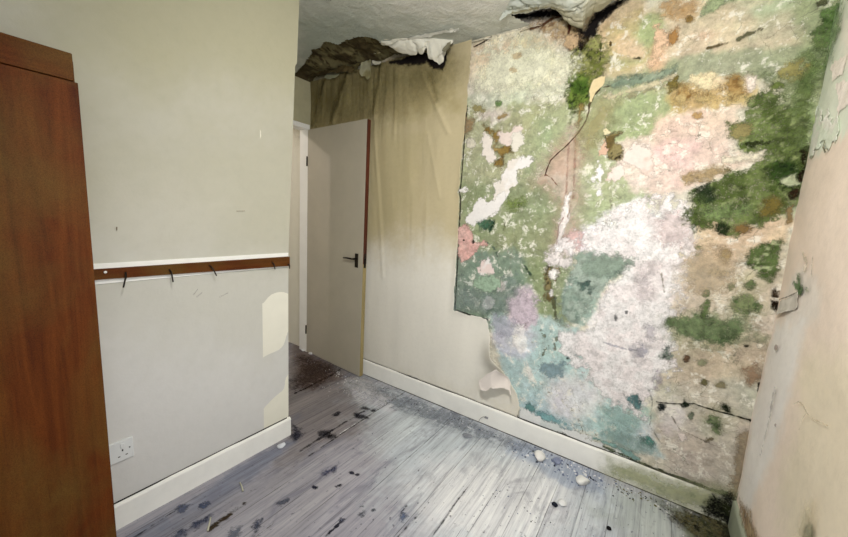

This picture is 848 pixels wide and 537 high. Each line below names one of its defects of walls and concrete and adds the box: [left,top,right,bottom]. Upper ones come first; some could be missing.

peeling [308,52,381,80]
damp [310,65,440,122]
peeling [809,0,848,158]
peeling [465,124,534,226]
peeling [591,128,657,196]
damp [550,0,841,421]
peeling [477,258,507,310]
peeling [519,407,735,498]
damp [640,436,656,448]
crack [648,390,751,497]
damp [611,466,757,537]